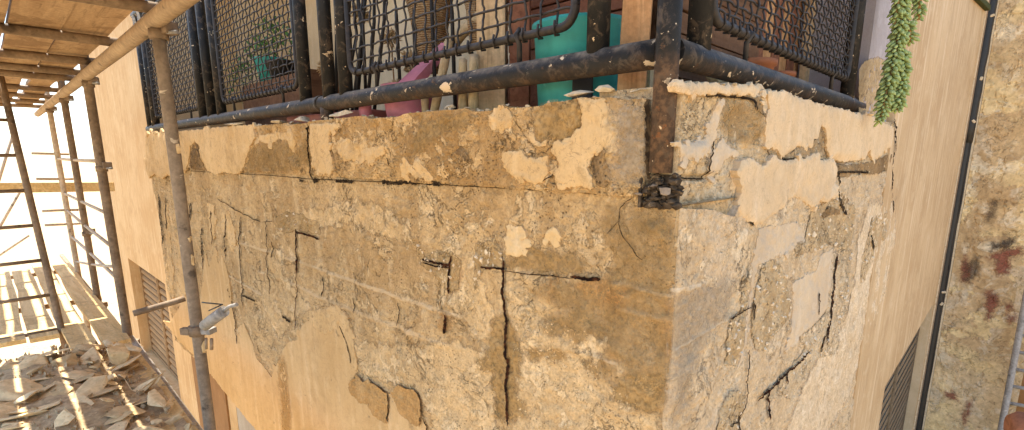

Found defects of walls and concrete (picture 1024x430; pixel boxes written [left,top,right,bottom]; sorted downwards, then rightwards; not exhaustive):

flaking render [144,128,170,179]
flaking render [178,122,296,174]
flaking render [488,105,516,135]
flaking render [528,97,620,193]
crack [158,194,324,343]
flaking render [163,196,562,430]
crack [422,256,452,334]
crack [480,257,600,425]
flaking render [634,57,896,430]
crack [731,256,838,430]